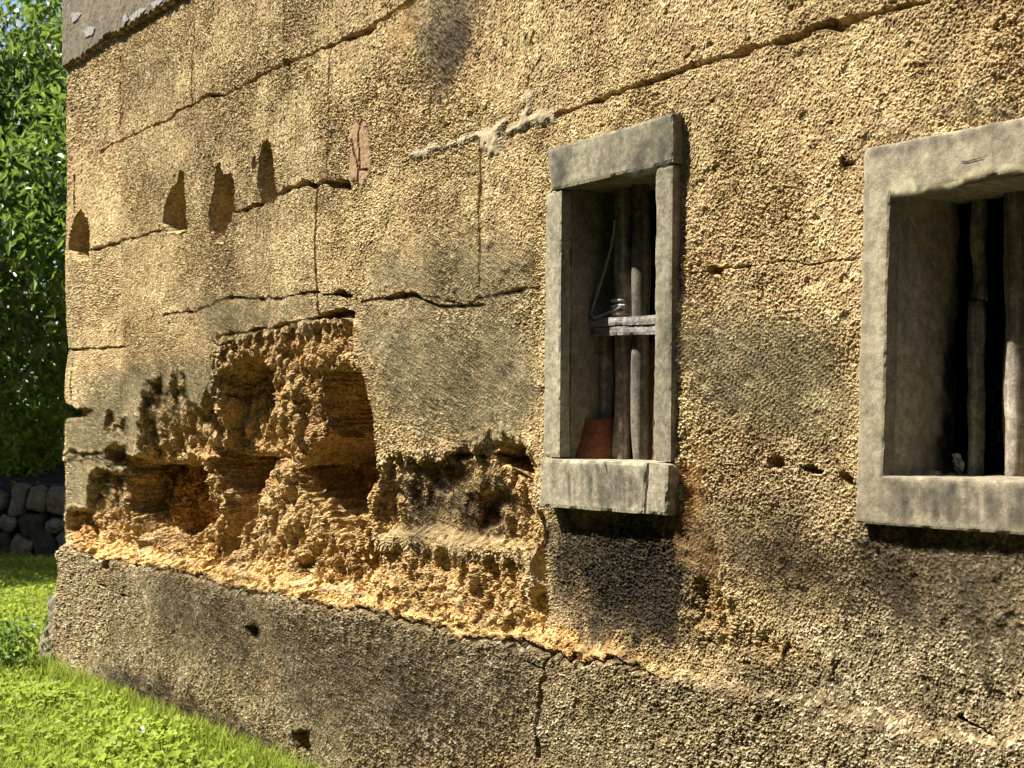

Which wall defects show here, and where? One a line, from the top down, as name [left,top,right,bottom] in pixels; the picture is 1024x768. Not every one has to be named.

crack [556,0,931,115]
crack [101,0,417,151]
crack [234,178,352,213]
crack [91,228,164,251]
crack [692,256,857,274]
crack [165,286,541,353]
spalling [65,308,548,631]
spalling [768,452,786,471]
spalling [839,470,854,487]
spalling [674,457,850,673]
spalling [246,622,261,640]